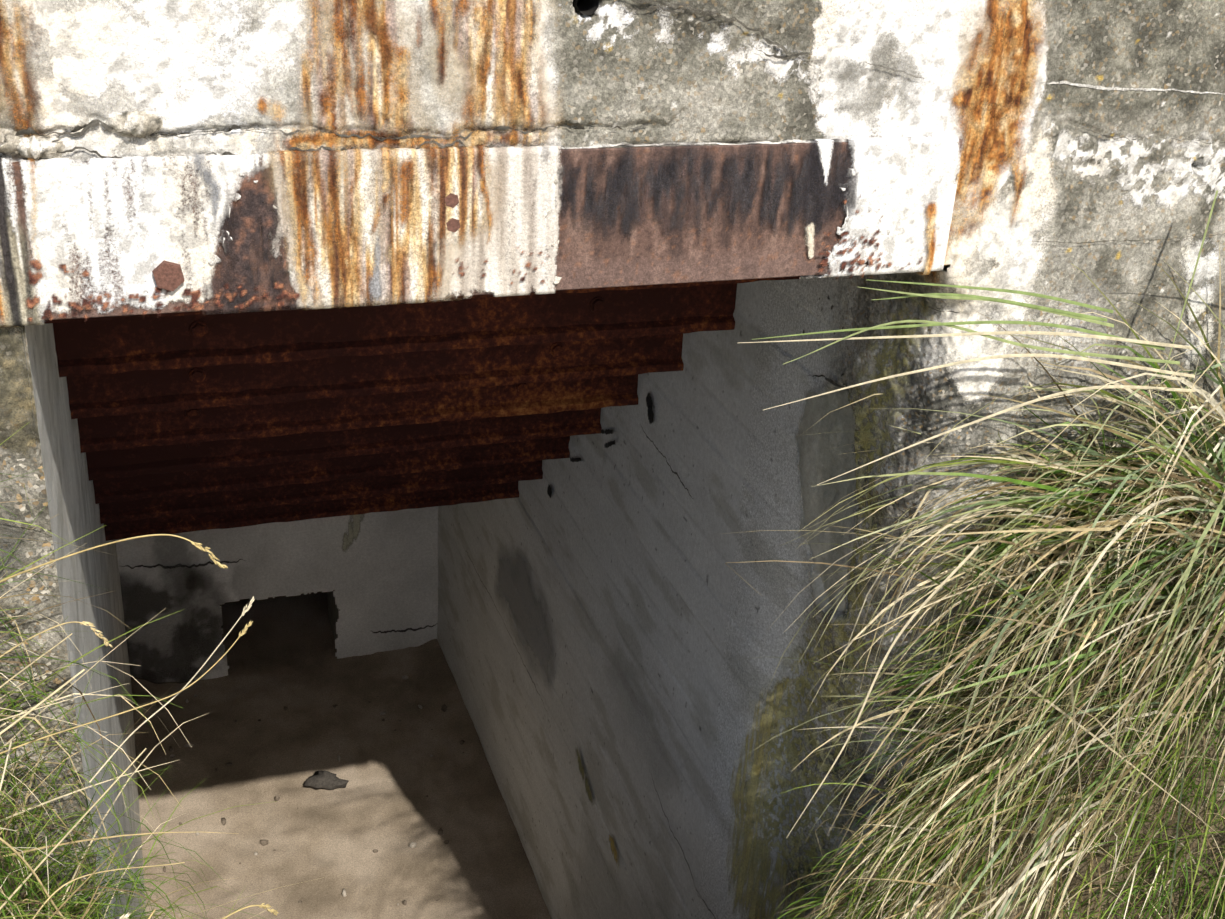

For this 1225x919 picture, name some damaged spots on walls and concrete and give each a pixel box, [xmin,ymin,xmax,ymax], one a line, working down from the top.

leakage [0,156,18,289]
crack [2,119,122,158]
peeling [0,0,351,317]
rust [0,0,546,327]
peeling [367,149,402,236]
crack [150,120,679,160]
peeling [428,145,564,301]
rust [818,0,1042,281]
leakage [0,326,38,455]